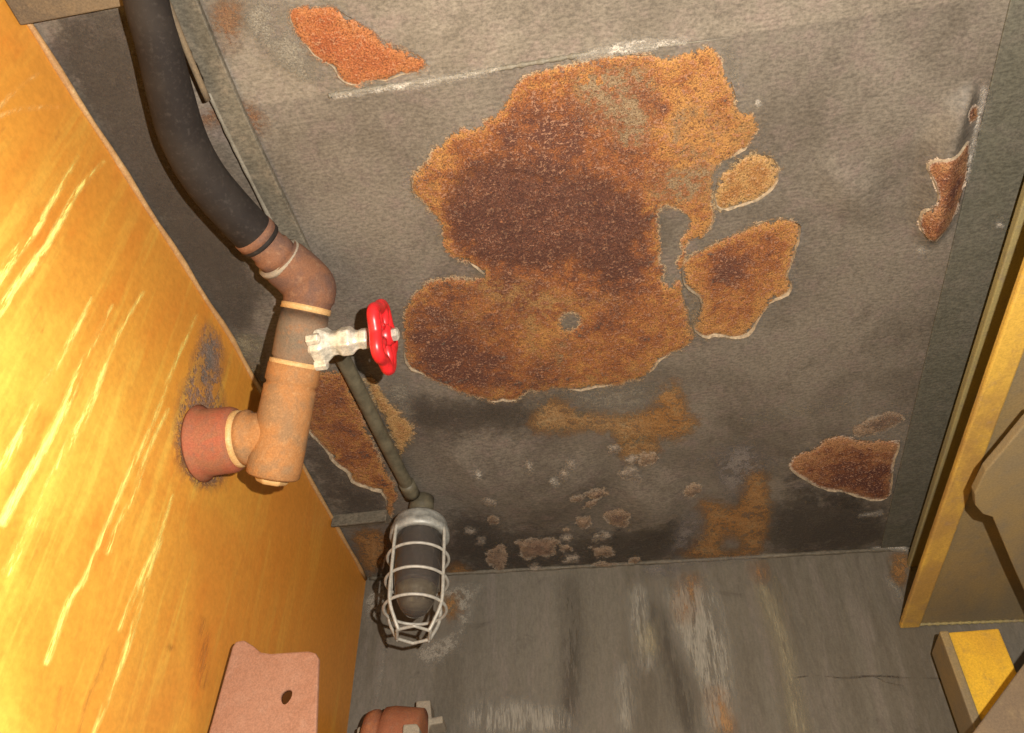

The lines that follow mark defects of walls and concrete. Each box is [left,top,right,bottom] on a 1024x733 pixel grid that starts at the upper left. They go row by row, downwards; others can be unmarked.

corrosion [286,5,429,89]
corrosion [916,141,971,242]
corrosion [401,45,801,481]
corrosion [309,369,399,518]
corrosion [362,377,417,457]
corrosion [789,411,905,501]
corrosion [465,488,640,572]